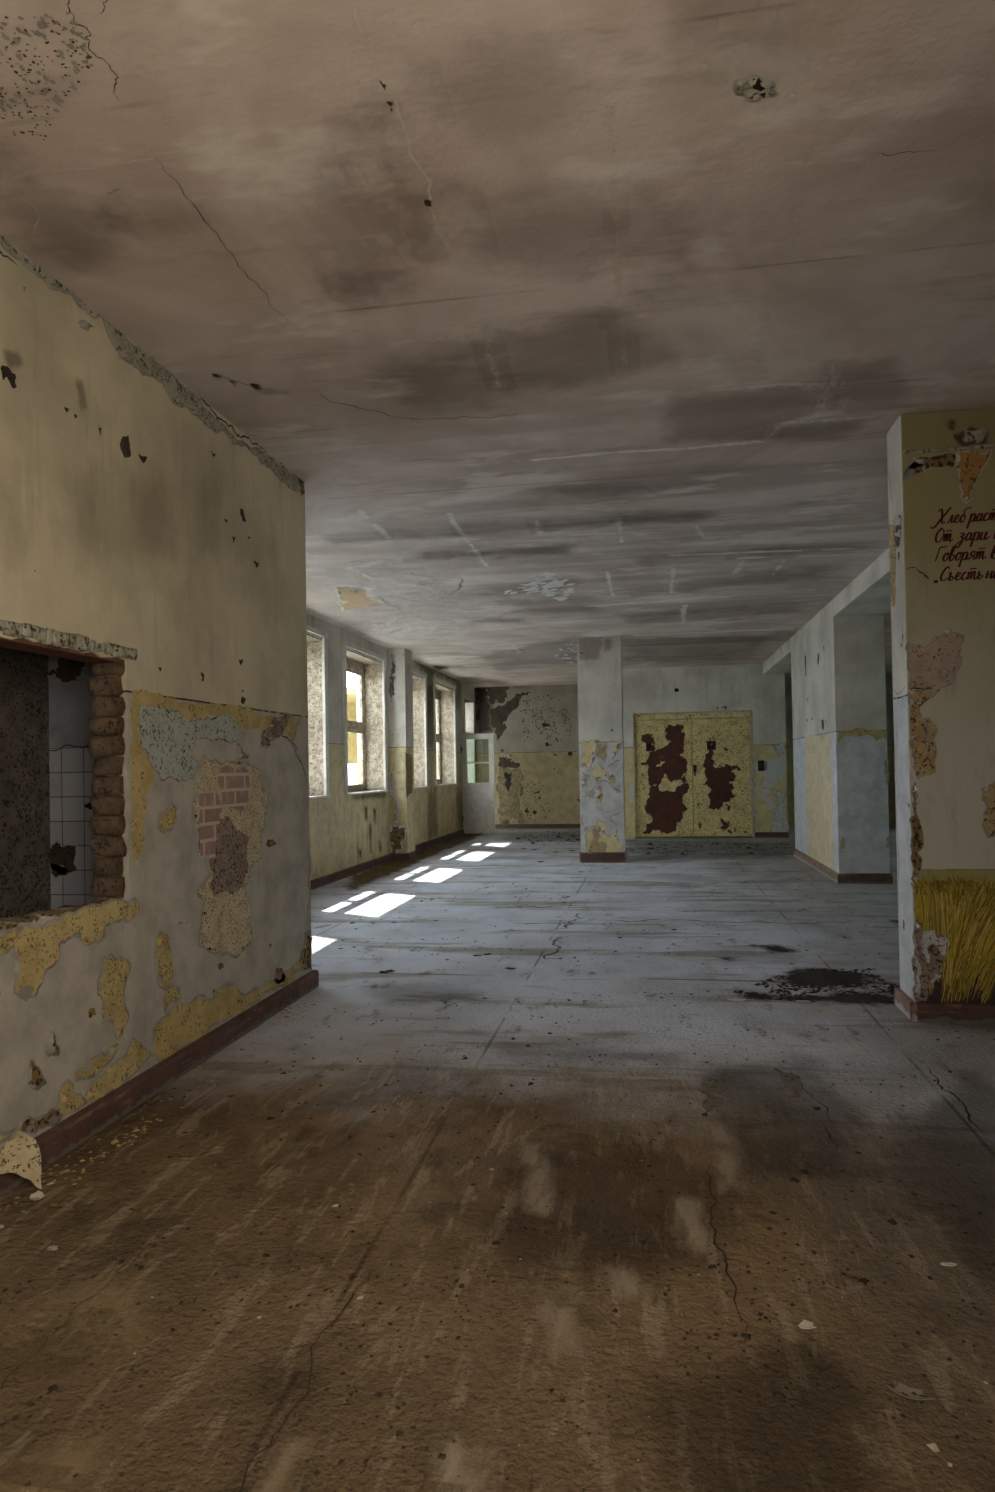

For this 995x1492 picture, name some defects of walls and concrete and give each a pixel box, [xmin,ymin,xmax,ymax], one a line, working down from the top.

spalling [0,12,93,140]
crack [67,0,119,101]
spalling [731,72,780,103]
crack [153,154,296,327]
crack [212,373,262,390]
peeling [888,511,902,607]
flaking render [0,619,137,684]
peeling [486,686,888,870]
peeling [901,627,964,878]
peeling [981,781,995,838]
flaking render [0,690,313,1201]